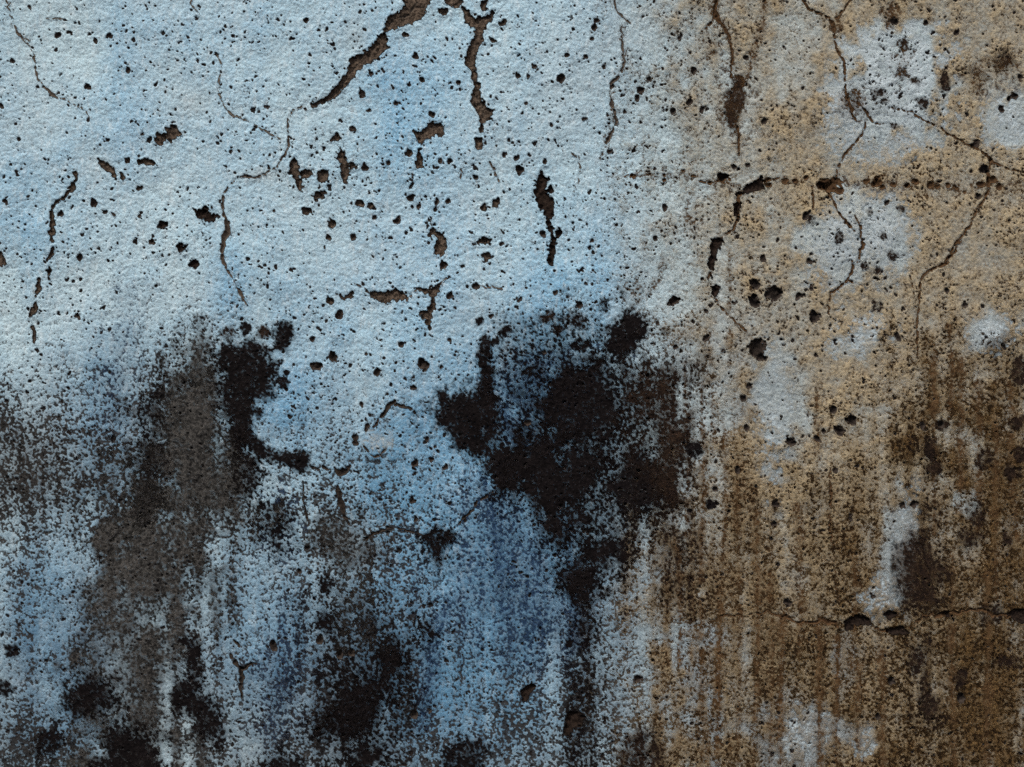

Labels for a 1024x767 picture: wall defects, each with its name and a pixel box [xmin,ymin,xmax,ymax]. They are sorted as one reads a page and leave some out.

crack [28,171,78,343]
water stain [0,297,717,767]
corrosion [618,0,1024,767]
crack [624,0,1024,356]